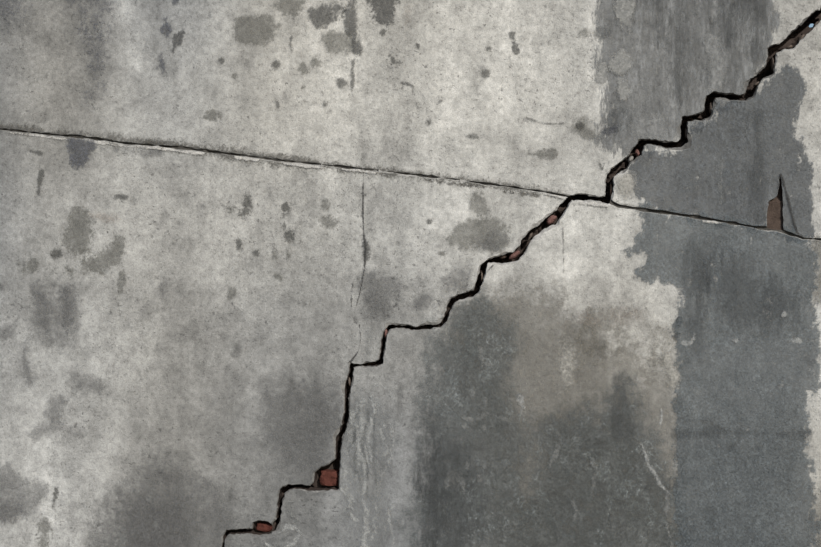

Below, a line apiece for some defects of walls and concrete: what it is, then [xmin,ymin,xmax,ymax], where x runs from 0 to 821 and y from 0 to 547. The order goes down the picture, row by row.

mould [283,0,363,88]
mould [367,0,400,35]
crack [0,124,571,199]
crack [333,5,821,466]
spalling [767,177,784,230]
leakage [406,0,821,547]
crack [221,484,341,547]